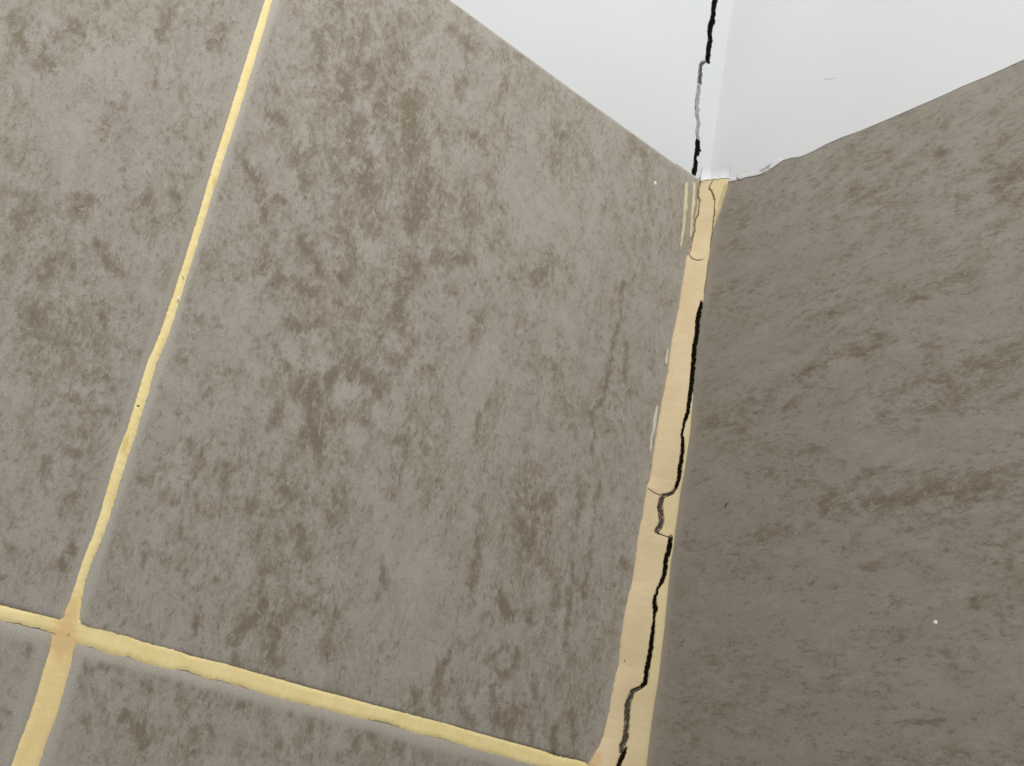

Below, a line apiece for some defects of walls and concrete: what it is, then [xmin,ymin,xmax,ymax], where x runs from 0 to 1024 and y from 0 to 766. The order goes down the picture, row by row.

crack [616,0,718,766]